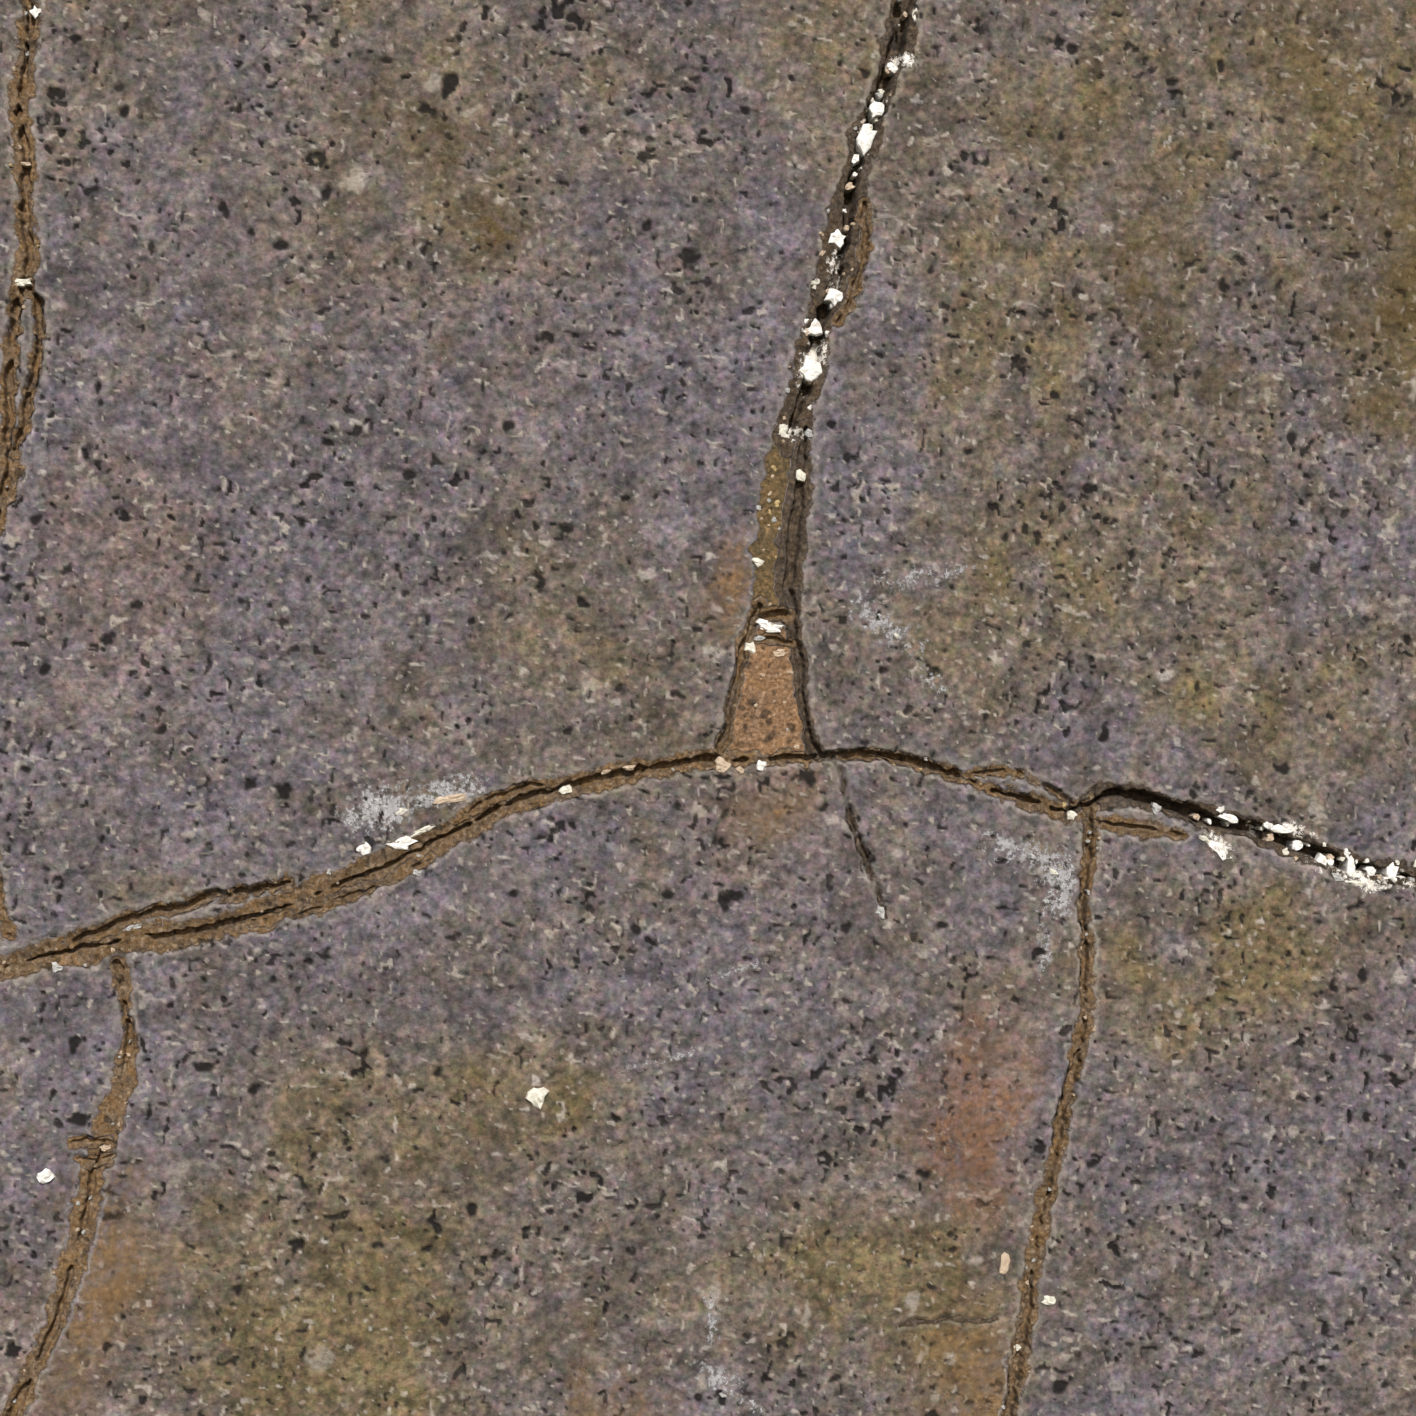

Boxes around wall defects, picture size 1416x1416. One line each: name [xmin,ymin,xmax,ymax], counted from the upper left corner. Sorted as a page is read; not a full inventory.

crack [0,0,918,981]
crack [0,956,139,1416]
crack [827,747,1416,1416]